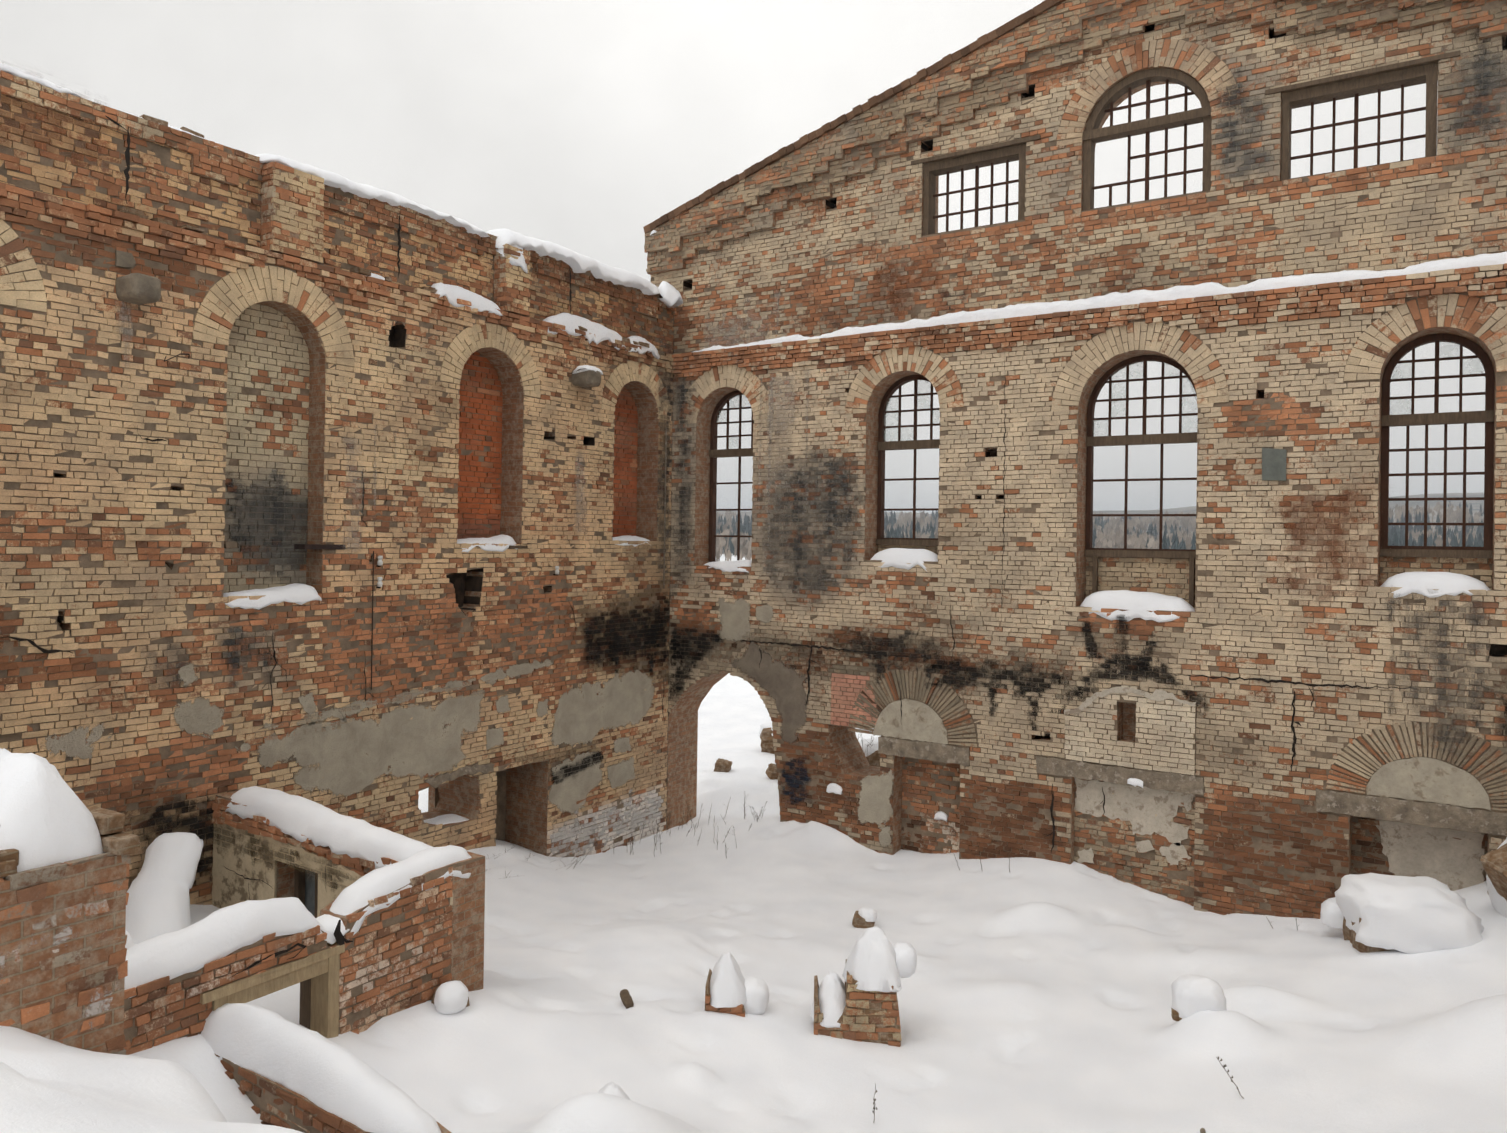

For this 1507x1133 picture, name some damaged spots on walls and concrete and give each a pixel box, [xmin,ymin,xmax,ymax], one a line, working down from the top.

flaking render [45,568,575,812]
flaking render [536,669,656,815]
leakage [988,687,997,716]
leakage [1081,616,1156,671]